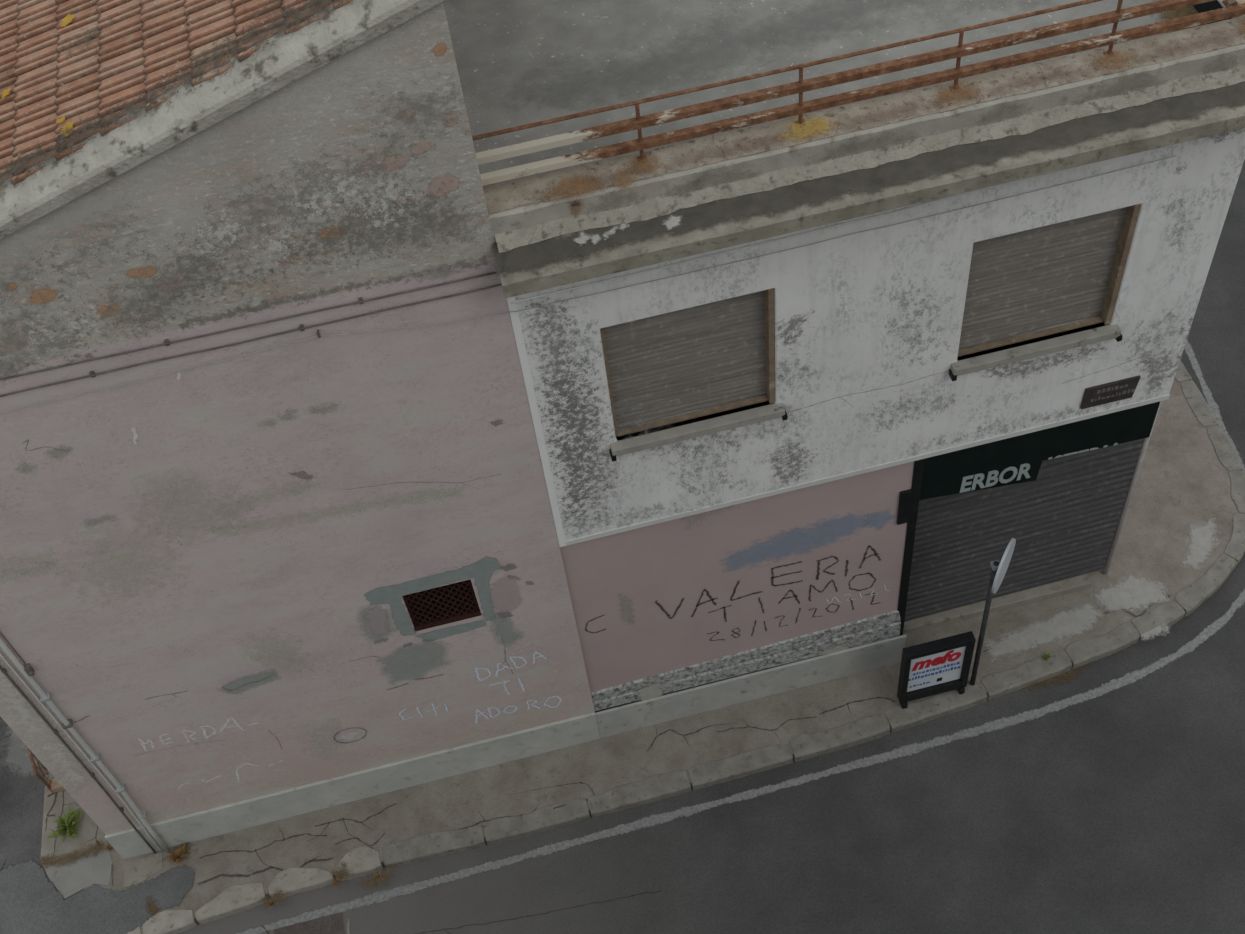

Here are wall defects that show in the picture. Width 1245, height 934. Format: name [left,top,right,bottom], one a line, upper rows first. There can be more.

corrosion [778,115,832,140]
peeling [365,556,533,648]
crack [198,804,395,885]